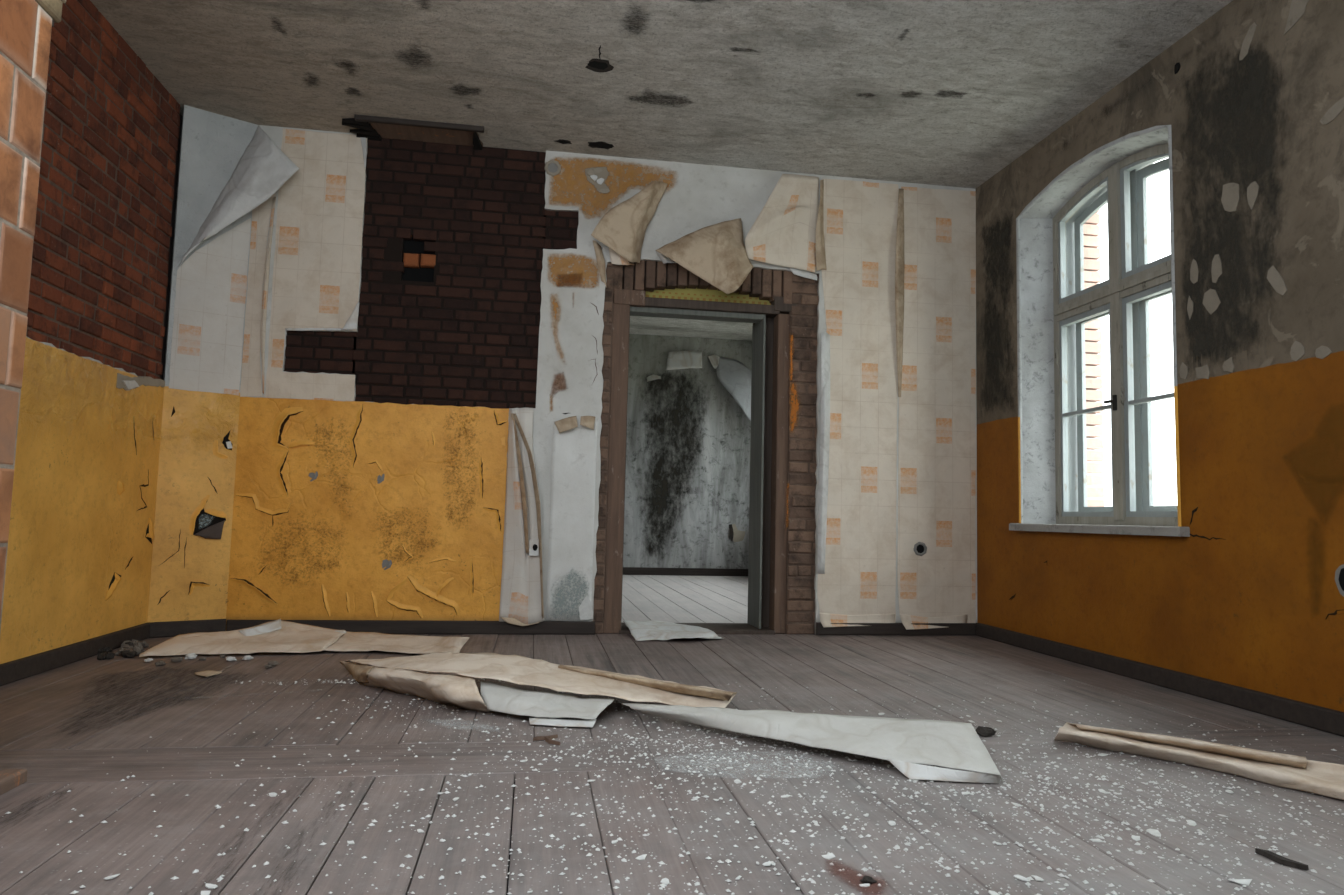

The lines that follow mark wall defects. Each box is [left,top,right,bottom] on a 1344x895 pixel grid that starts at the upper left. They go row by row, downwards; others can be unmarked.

flaking render [26,0,299,391]
flaking render [585,167,610,194]
mould [1183,48,1284,366]
flaking render [284,138,579,484]
peeling [189,495,227,535]
peeling [236,407,315,525]
mould [644,372,706,558]
peeling [229,565,278,607]
peeling [371,544,474,618]